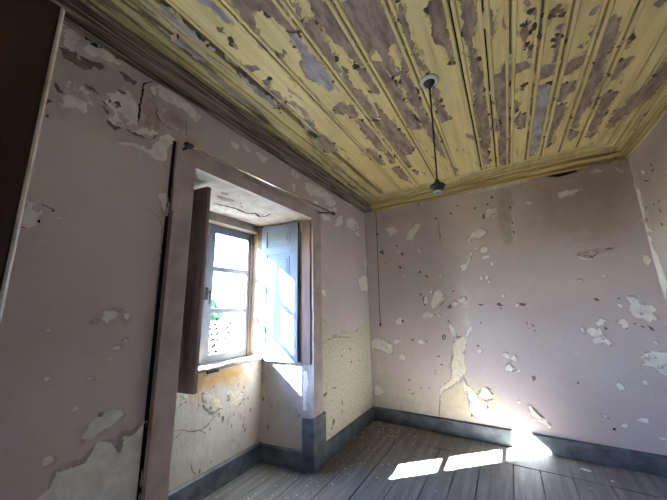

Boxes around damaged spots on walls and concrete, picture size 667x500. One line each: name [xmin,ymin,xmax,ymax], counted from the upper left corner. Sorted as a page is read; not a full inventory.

peeling [46,25,204,164]
crack [137,80,187,136]
peeling [197,0,456,181]
peeling [458,0,667,167]
crack [215,203,270,221]
peeling [37,409,147,500]
peeling [176,393,189,406]
crack [173,412,220,440]
peeling [198,385,246,423]
peeling [322,319,407,441]
peeling [418,290,496,422]
peeling [580,295,661,348]